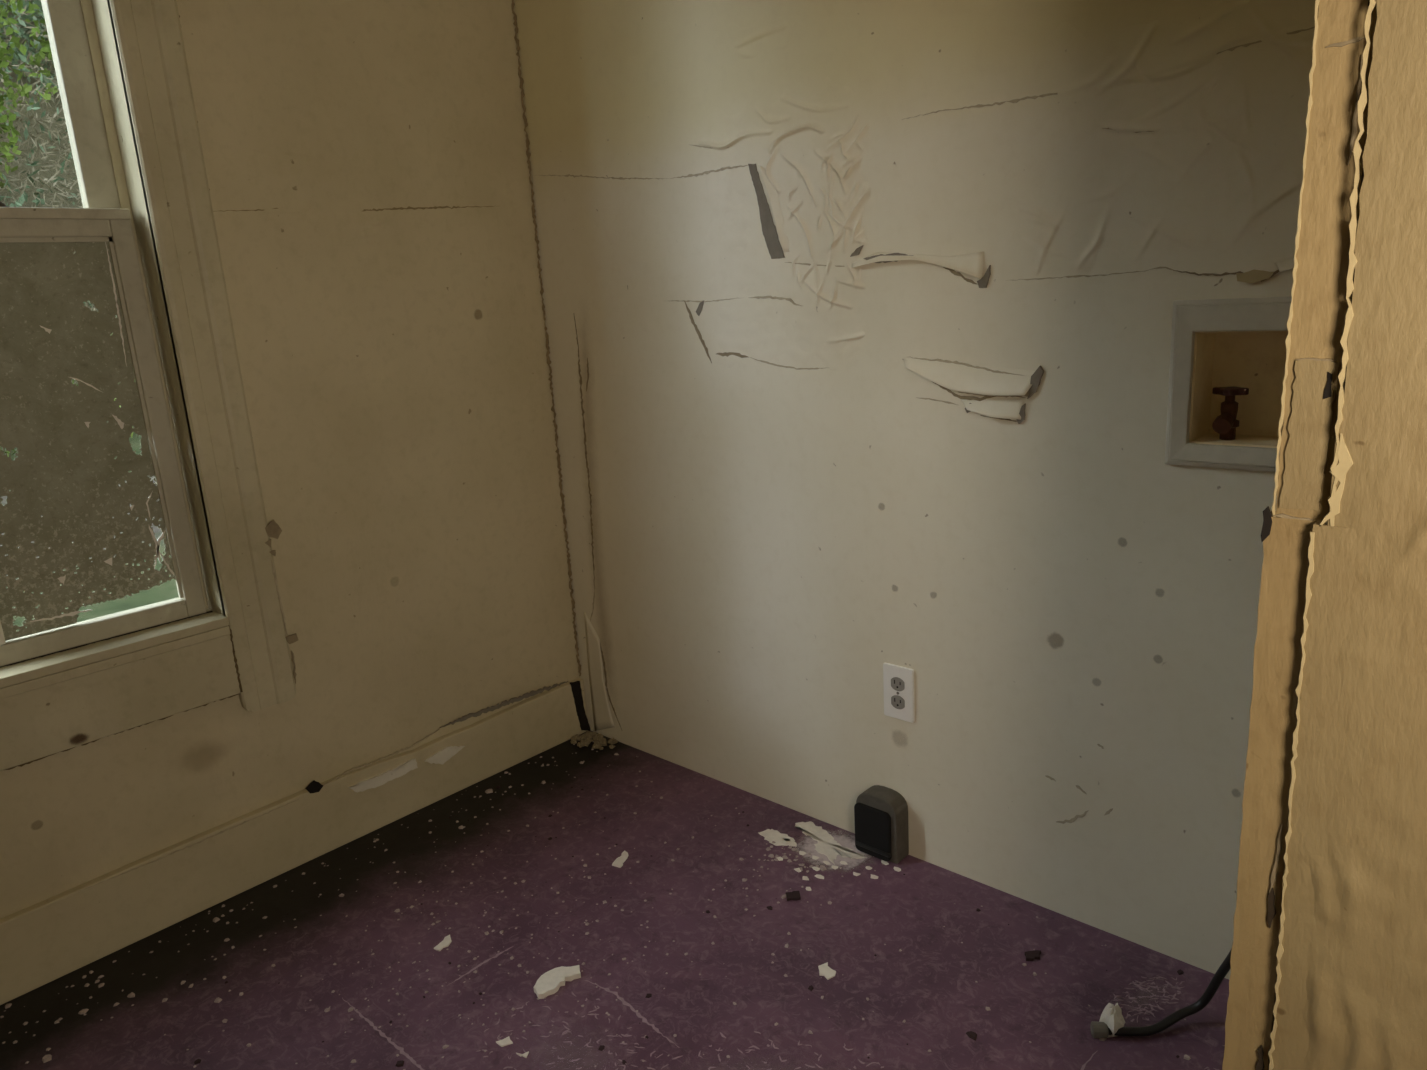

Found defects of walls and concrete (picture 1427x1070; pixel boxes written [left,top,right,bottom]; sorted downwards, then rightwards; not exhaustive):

peeling [759,166,789,252]
peeling [850,245,991,288]
peeling [903,356,1044,424]